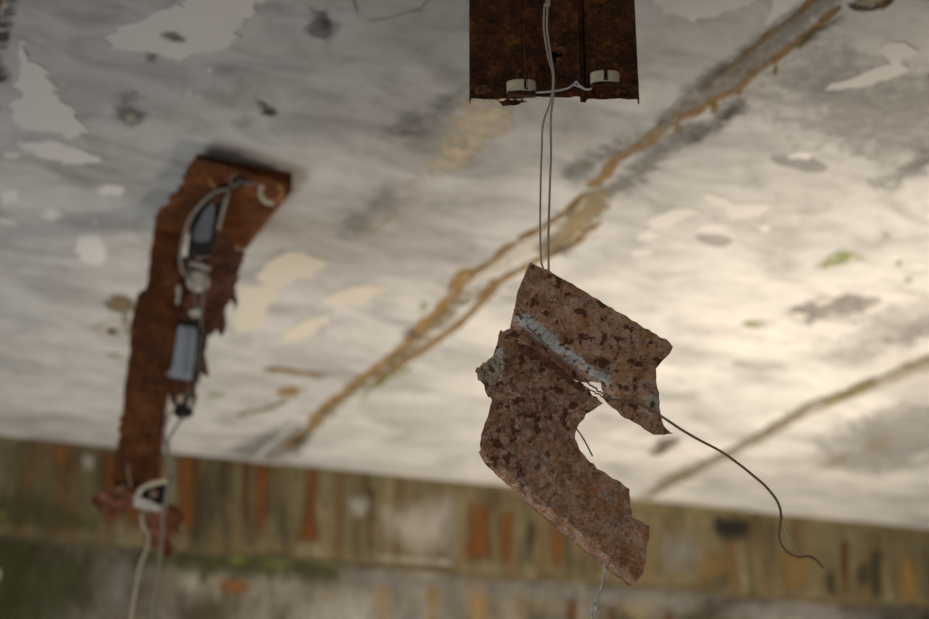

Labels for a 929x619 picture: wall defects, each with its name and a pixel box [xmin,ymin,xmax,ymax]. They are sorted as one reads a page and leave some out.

peeling [105,0,265,61]
peeling [764,0,805,26]
peeling [824,41,919,90]
peeling [4,40,106,165]
corrosion [284,0,841,449]
peeling [231,250,329,336]
peeling [279,284,391,342]
corrosion [236,386,306,417]
corrosion [264,367,323,378]
corrosion [648,438,682,455]
corrosion [179,456,195,533]
corrosion [299,469,319,542]